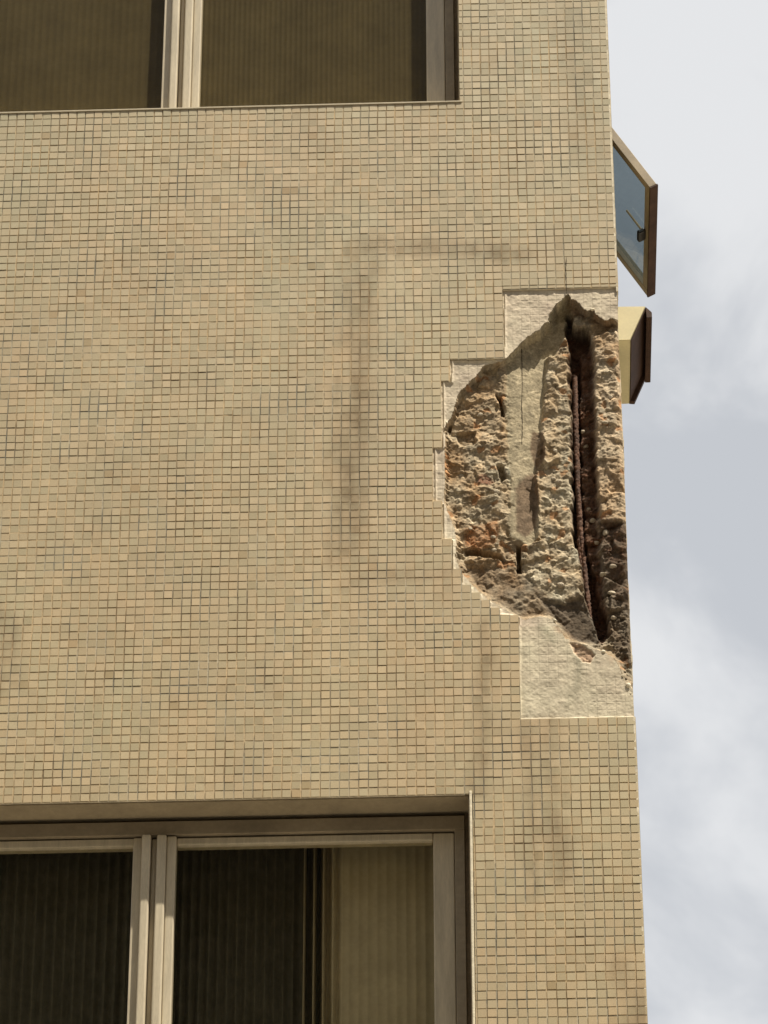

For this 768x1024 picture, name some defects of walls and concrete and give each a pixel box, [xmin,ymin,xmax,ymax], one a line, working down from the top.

spalling [433,288,634,719]